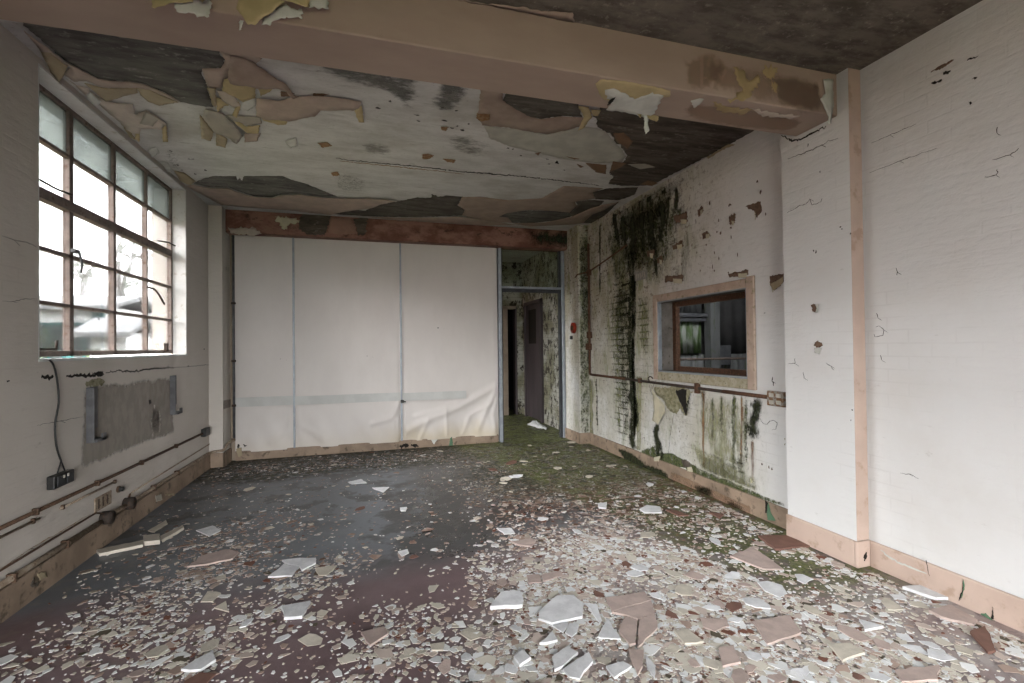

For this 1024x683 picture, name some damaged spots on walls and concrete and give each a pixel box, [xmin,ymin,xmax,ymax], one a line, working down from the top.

peeling [152,0,212,18]
peeling [236,0,329,31]
peeling [23,23,754,248]
crack [781,126,835,159]
spalling [746,180,766,220]
spalling [696,204,736,272]
spalling [728,269,748,278]
spalling [770,274,784,292]
leakage [579,178,684,477]
crack [41,364,206,380]
flaking render [650,385,693,461]
leakage [698,398,762,487]